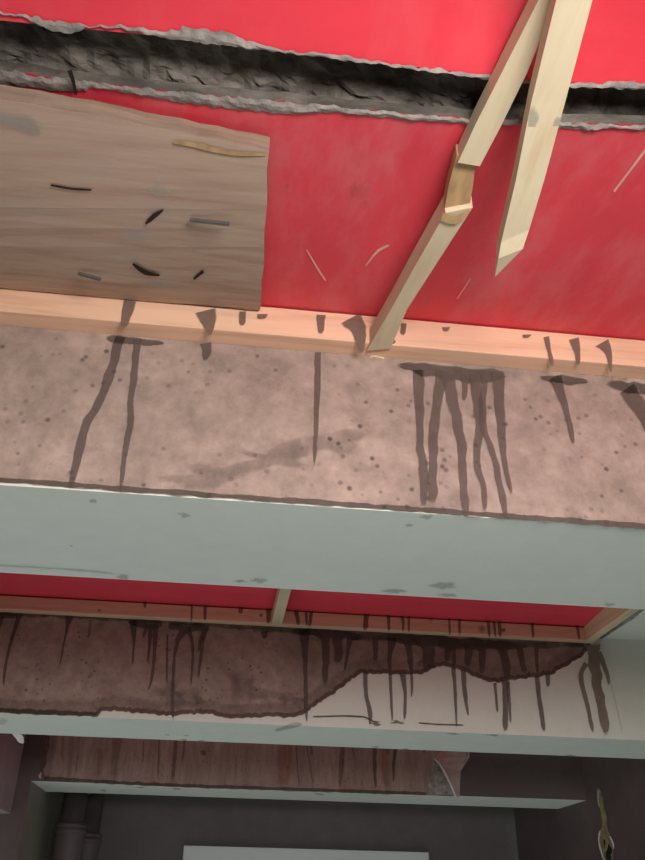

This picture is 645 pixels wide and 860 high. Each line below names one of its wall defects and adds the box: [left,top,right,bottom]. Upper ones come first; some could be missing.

spalling [0,20,488,110]
spalling [509,80,531,111]
spalling [562,87,645,115]
damp [69,335,163,487]
peeling [0,325,645,529]
damp [400,362,512,515]
damp [542,375,587,442]
damp [610,381,645,429]
peeling [0,609,643,719]
damp [363,633,550,730]
damp [579,644,610,733]
peeling [39,735,470,797]